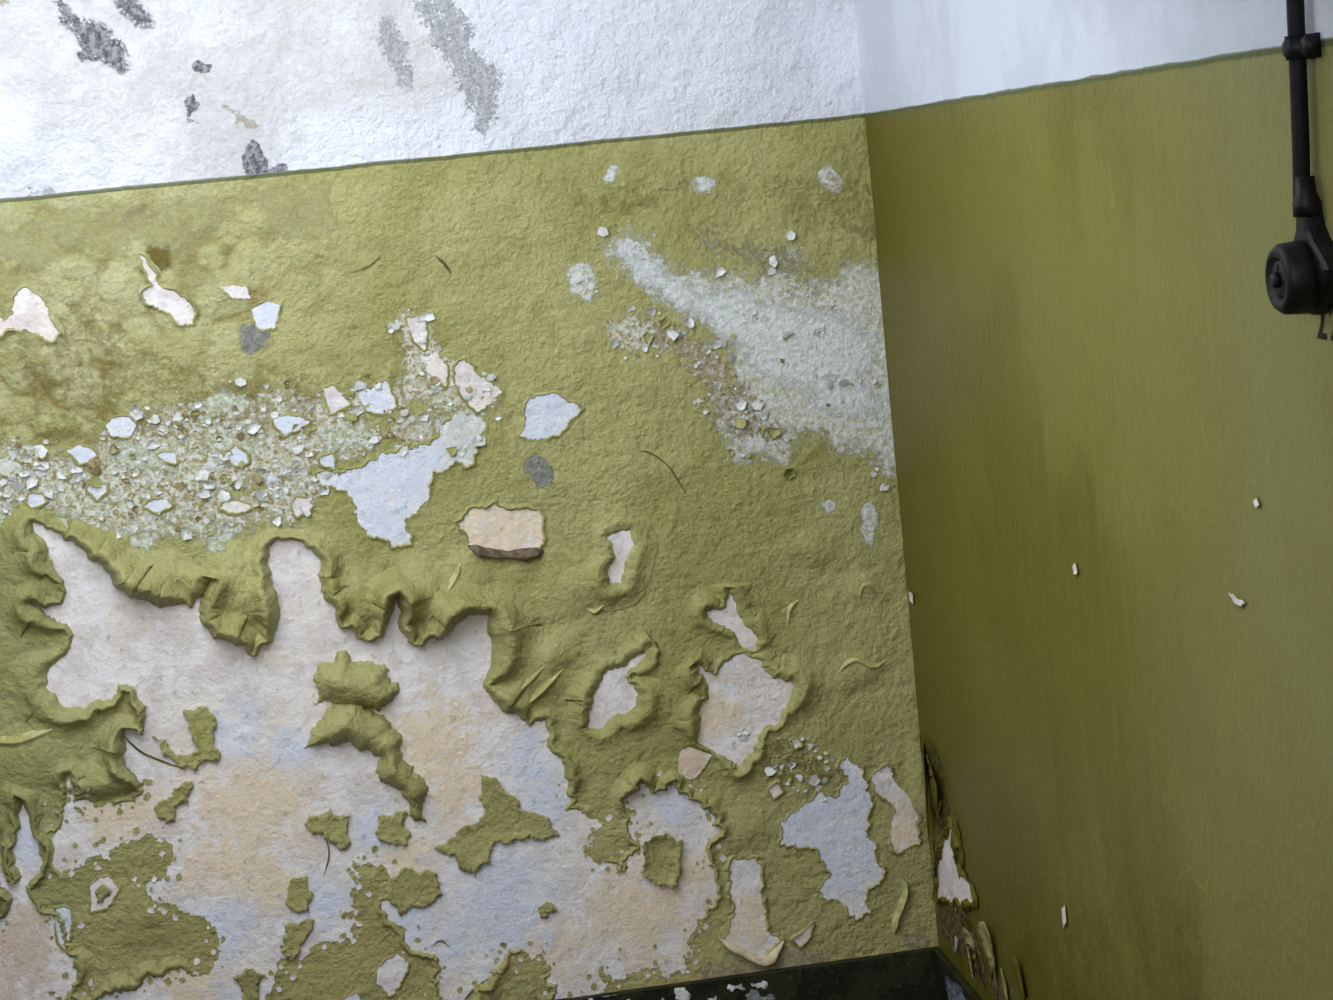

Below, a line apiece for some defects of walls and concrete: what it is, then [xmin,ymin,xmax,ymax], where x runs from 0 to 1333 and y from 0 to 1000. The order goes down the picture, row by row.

peeling [0,283,64,345]
damp [564,224,896,548]
peeling [0,305,1028,1000]